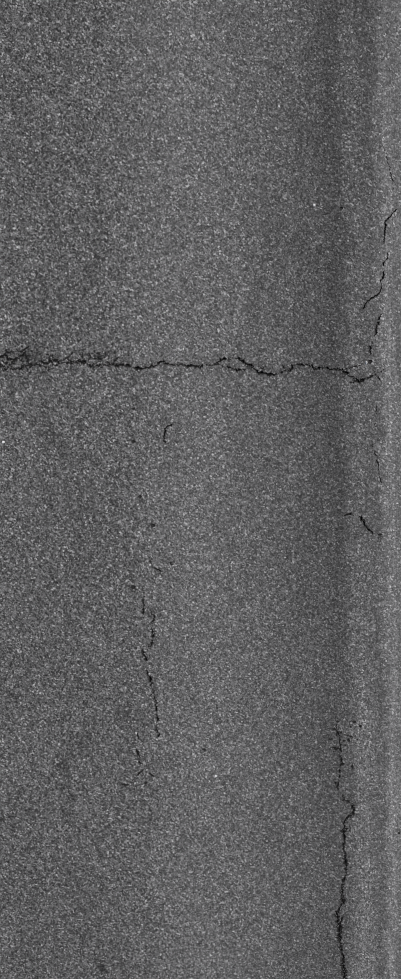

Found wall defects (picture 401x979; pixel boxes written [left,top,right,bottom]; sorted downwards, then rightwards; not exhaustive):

crack [0,146,397,483]
crack [120,557,173,786]
crack [327,724,356,979]